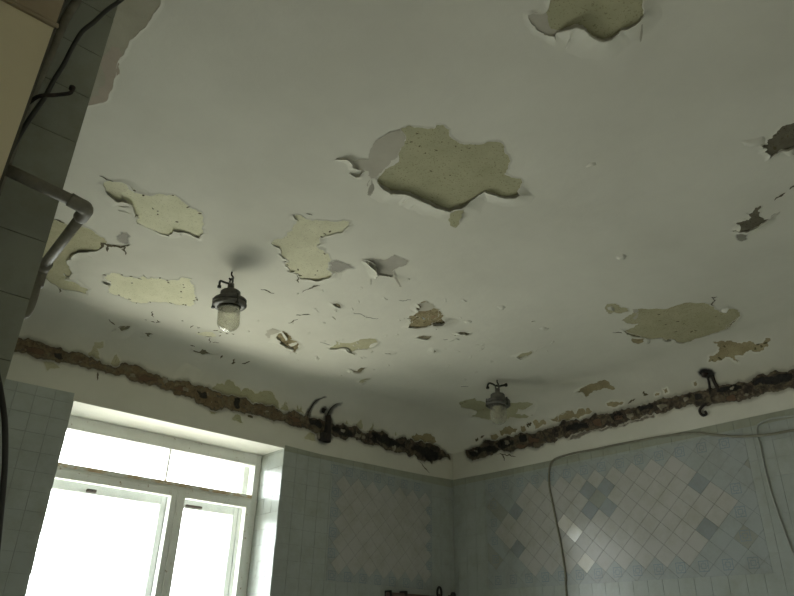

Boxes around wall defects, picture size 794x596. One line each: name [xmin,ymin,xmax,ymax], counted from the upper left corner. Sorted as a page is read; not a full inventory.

peeling [87,0,165,108]
peeling [523,0,662,60]
peeling [755,121,794,163]
peeling [334,123,536,228]
peeling [95,176,210,242]
peeling [45,226,129,295]
peeling [266,213,355,285]
peeling [359,254,410,287]
peeling [265,328,305,355]
peeling [401,300,473,341]
peeling [603,297,772,365]
peeling [457,379,670,442]